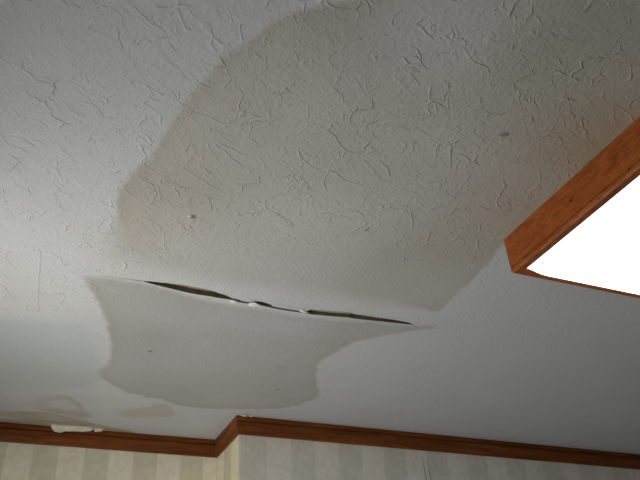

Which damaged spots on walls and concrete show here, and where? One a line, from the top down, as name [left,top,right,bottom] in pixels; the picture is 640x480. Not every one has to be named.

damp [69,0,640,421]
crack [107,276,417,327]
peeling [51,424,103,433]